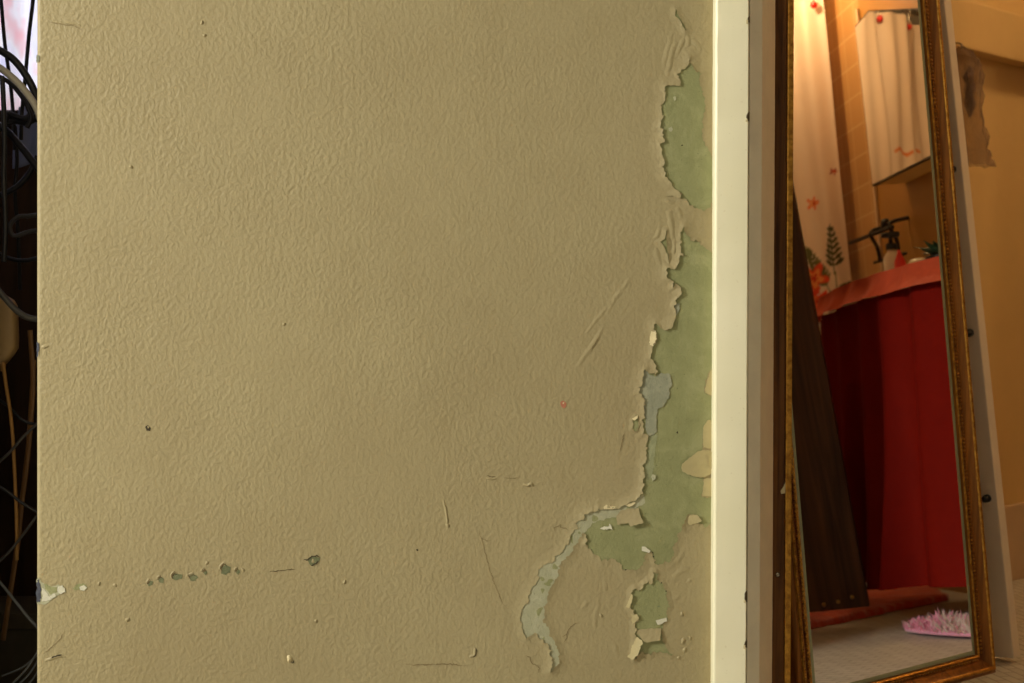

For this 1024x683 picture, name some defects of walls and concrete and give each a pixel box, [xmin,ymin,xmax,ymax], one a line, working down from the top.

spalling [36,578,87,605]
peeling [512,45,712,681]